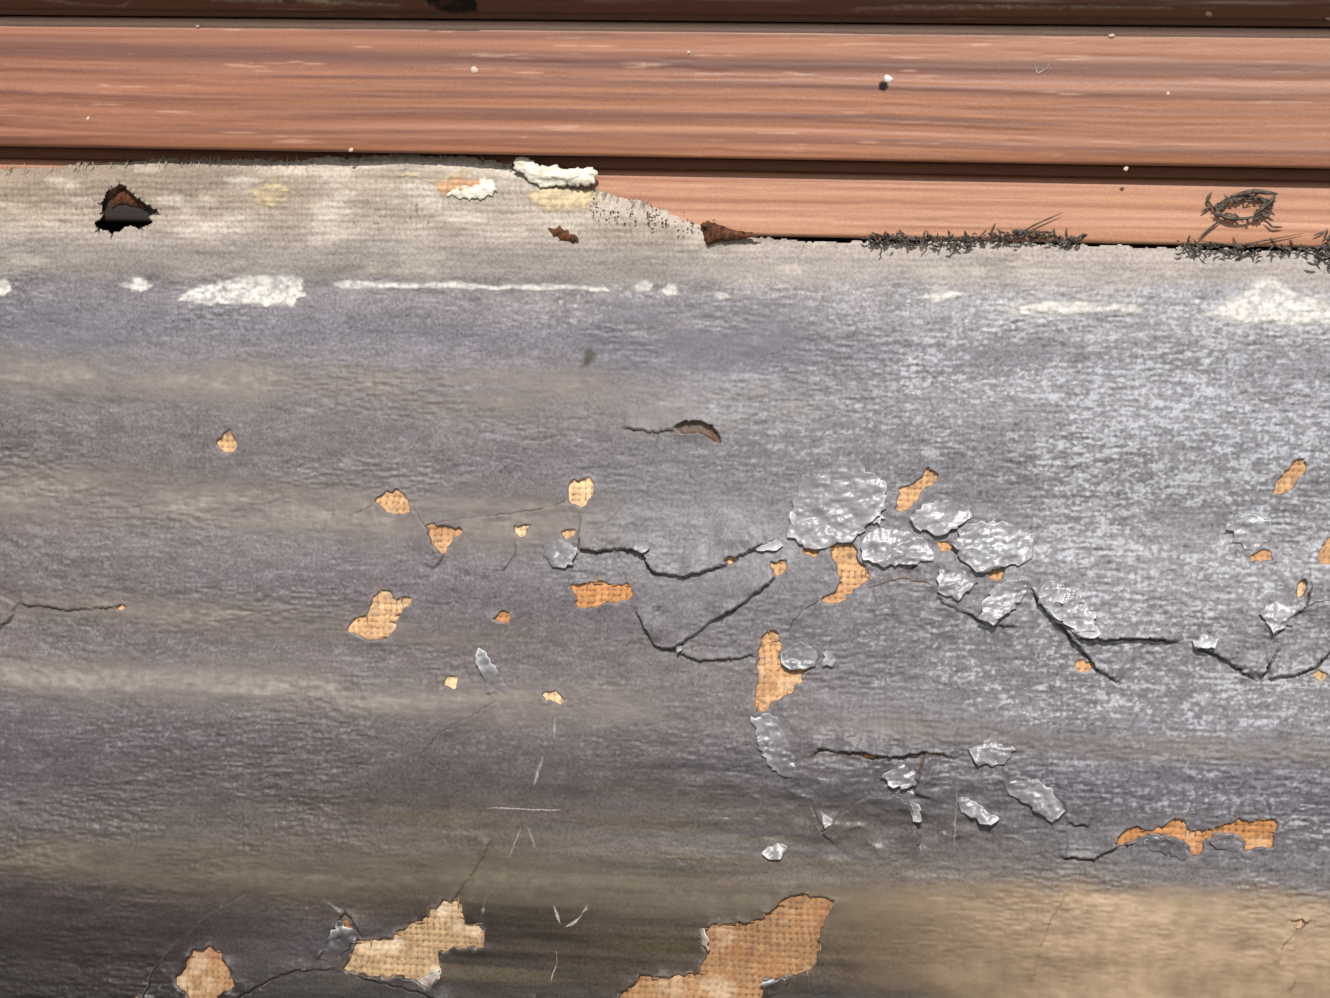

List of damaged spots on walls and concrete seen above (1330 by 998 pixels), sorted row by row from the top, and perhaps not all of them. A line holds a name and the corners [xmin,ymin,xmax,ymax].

peeling [755,454,1100,639]
crack [0,604,118,630]
peeling [348,582,411,640]
peeling [1192,634,1220,649]
peeling [750,630,836,781]
peeling [880,763,922,822]
peeling [956,796,1000,826]
peeling [968,738,1066,823]
peeling [1113,815,1277,860]
peeling [177,945,234,998]
peeling [316,897,485,989]
peeling [619,892,833,998]